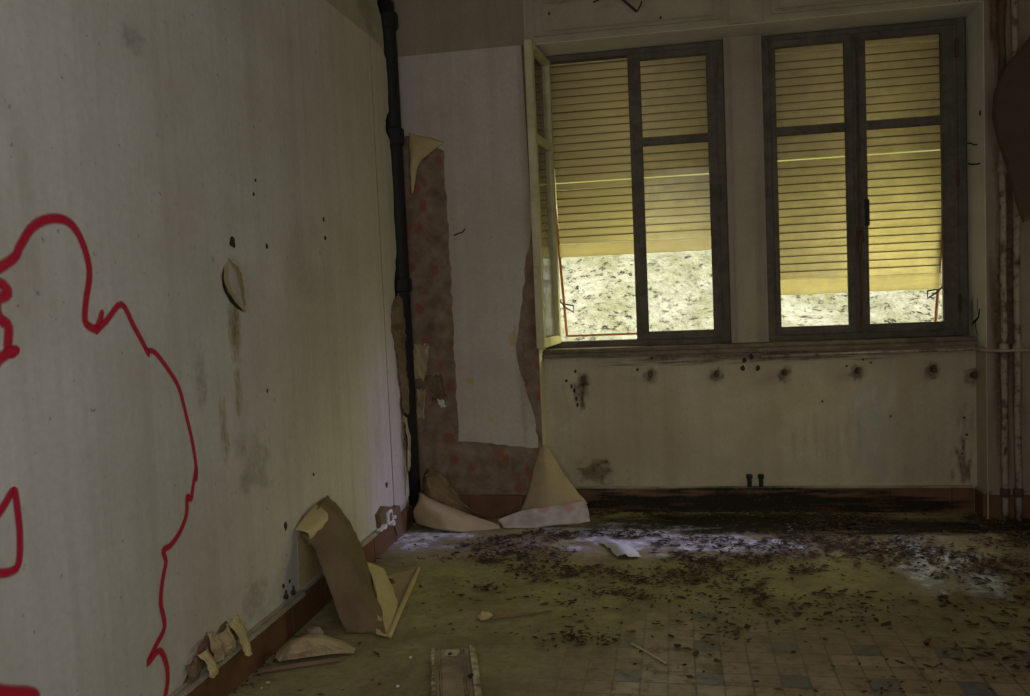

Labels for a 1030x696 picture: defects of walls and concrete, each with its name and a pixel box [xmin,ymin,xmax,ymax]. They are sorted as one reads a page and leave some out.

peeling [220,258,246,313]
peeling [391,293,448,471]